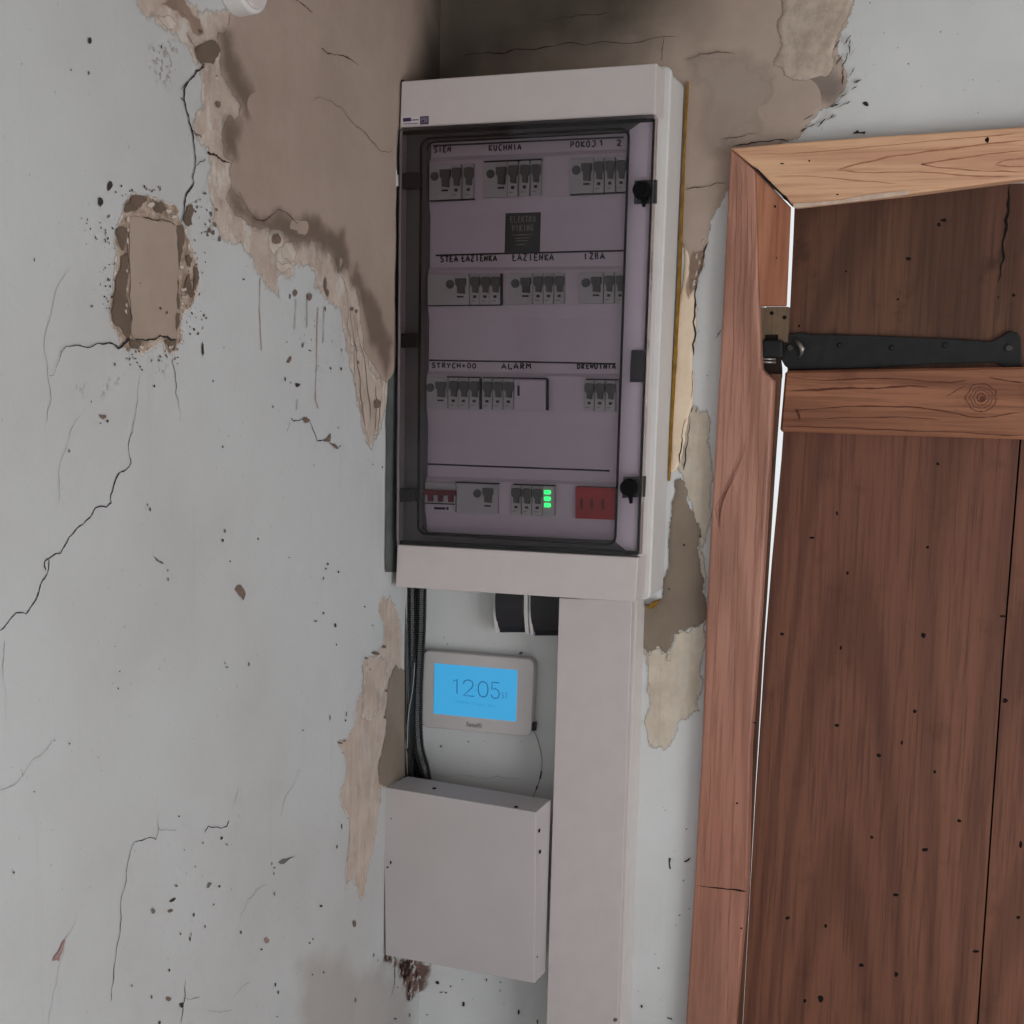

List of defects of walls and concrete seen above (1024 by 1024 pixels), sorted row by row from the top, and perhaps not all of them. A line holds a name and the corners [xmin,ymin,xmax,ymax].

crack [44,64,298,420]
flaking render [81,0,437,449]
flaking render [473,0,862,297]
crack [0,376,140,716]
flaking render [643,405,713,750]
crack [111,814,175,1000]
peeling [337,596,408,901]